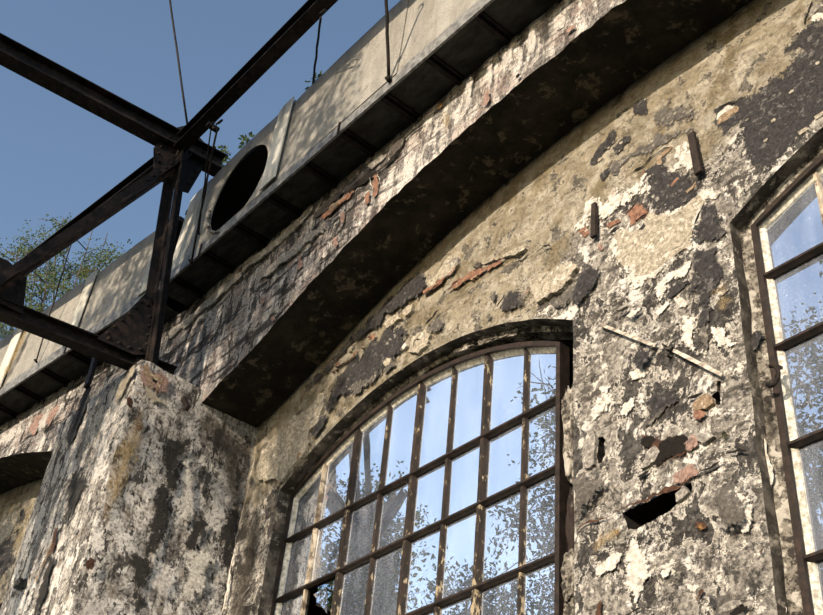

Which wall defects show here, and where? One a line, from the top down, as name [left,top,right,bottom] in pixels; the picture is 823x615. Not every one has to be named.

spalling [711,0,823,178]
spalling [590,97,728,243]
spalling [168,138,405,339]
spalling [139,364,170,403]
spalling [638,381,721,477]
spalling [672,461,720,484]
spalling [0,510,26,577]